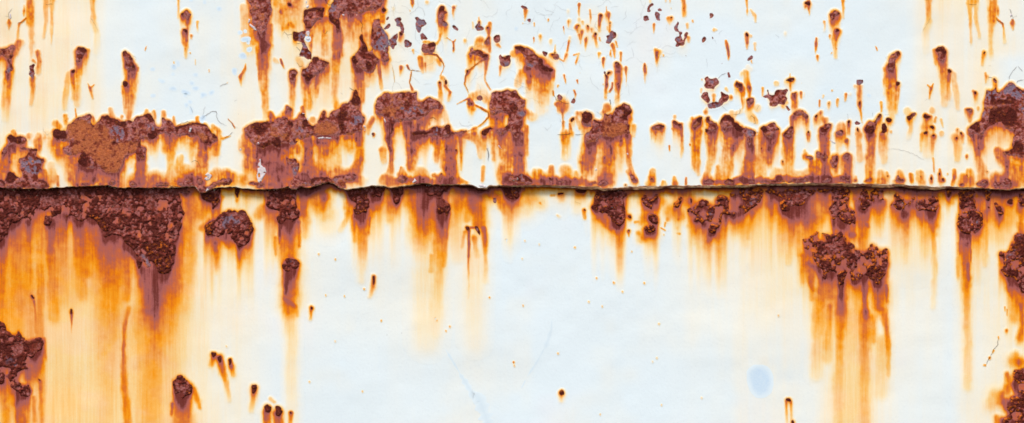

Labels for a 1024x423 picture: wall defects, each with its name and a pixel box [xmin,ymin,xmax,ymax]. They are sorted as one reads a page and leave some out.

rust [0,0,641,423]
rust [376,0,1024,423]